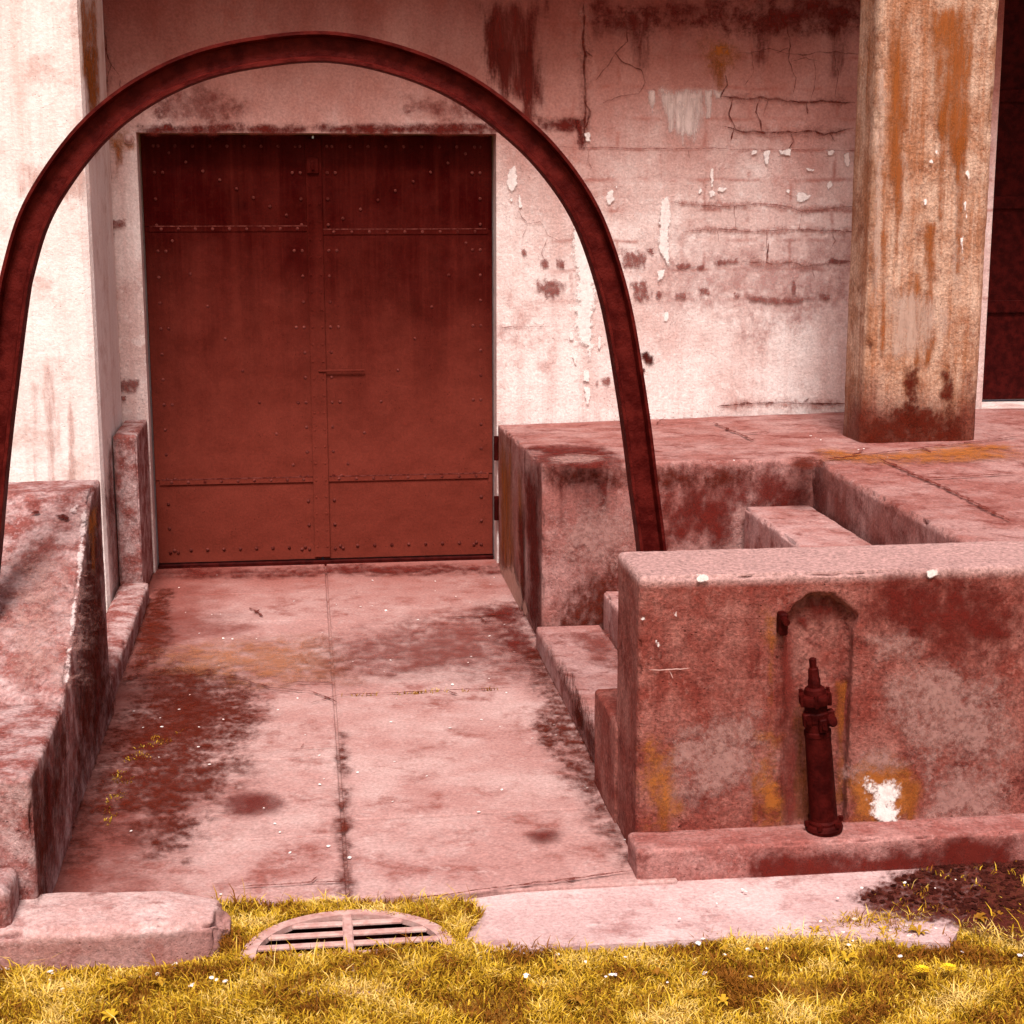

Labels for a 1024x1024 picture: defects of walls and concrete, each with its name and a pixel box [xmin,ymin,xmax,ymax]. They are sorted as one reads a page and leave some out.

peeling [507,166,523,208]
water stain [484,4,585,148]
peeling [536,227,610,404]
peeling [622,197,738,302]
crack [564,4,855,168]
spalling [734,281,830,304]
corrosion [881,34,907,253]
corrosion [914,179,944,369]
corrosion [932,7,976,271]
water stain [904,368,918,426]
corrosion [824,444,1010,463]
water stain [941,371,954,411]